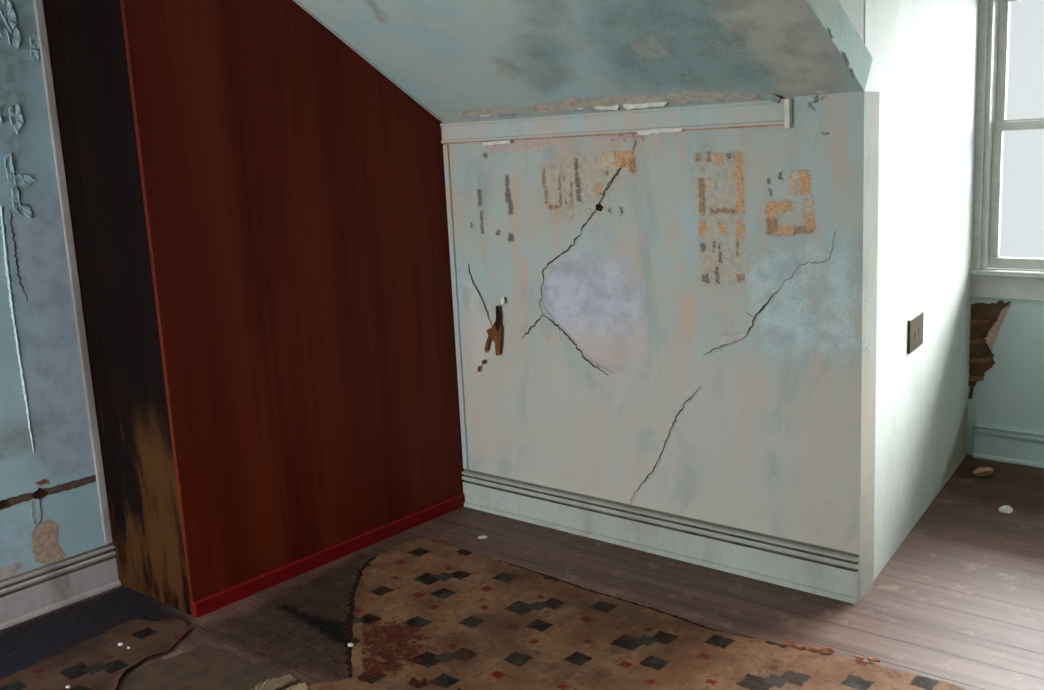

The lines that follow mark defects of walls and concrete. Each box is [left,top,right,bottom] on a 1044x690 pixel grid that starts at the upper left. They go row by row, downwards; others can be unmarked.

crack [523,141,638,376]
crack [704,230,836,356]
flaking render [968,300,1011,399]
crack [630,386,701,505]